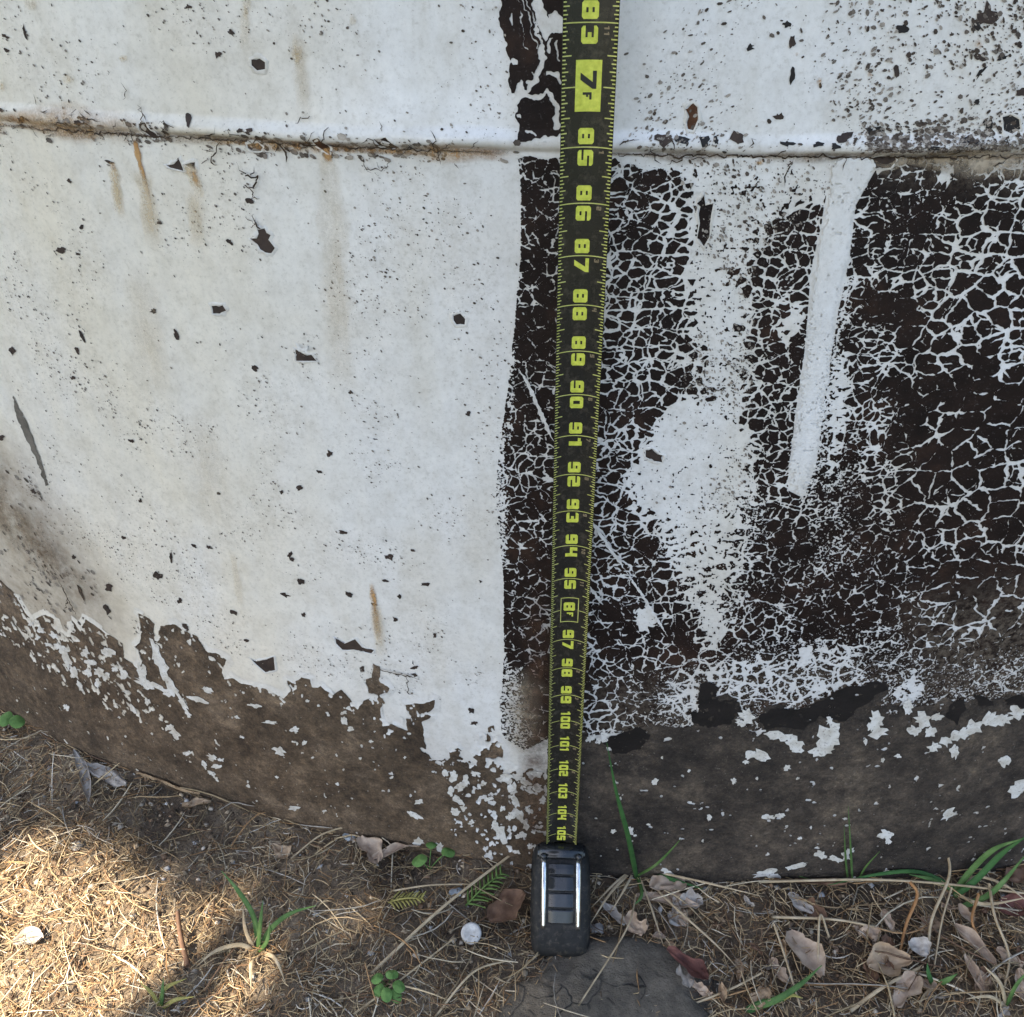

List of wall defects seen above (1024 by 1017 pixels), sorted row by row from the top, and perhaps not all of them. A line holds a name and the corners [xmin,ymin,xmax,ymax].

rust [0,116,347,224]
peeling [0,155,560,872]
rust [370,588,380,632]
peeling [577,146,1024,883]